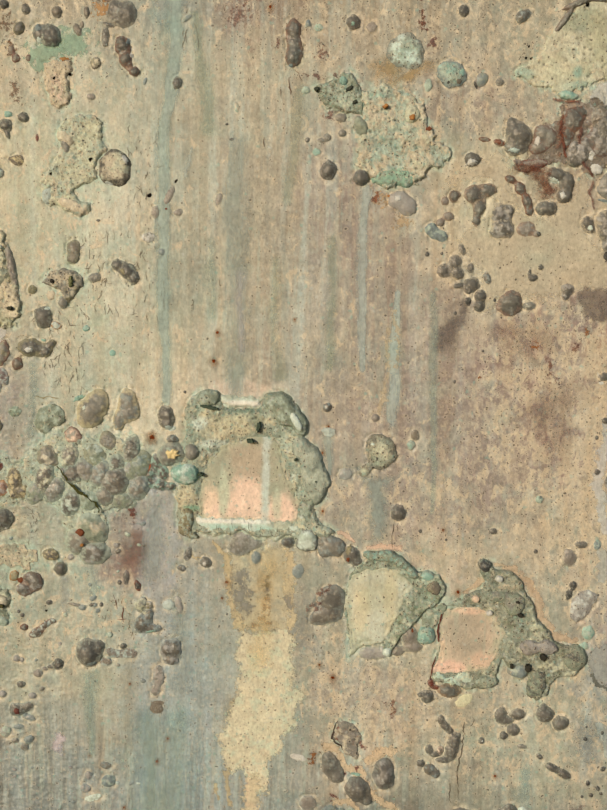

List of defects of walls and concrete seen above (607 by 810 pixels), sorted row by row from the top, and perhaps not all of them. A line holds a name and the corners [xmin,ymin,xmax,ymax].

spalling [23,25,90,109]
peeling [515,0,607,101]
peeling [39,114,108,217]
peeling [0,230,22,329]
peeling [157,389,355,543]
water stain [212,541,306,810]
peeling [344,544,588,707]
crack [449,719,475,802]